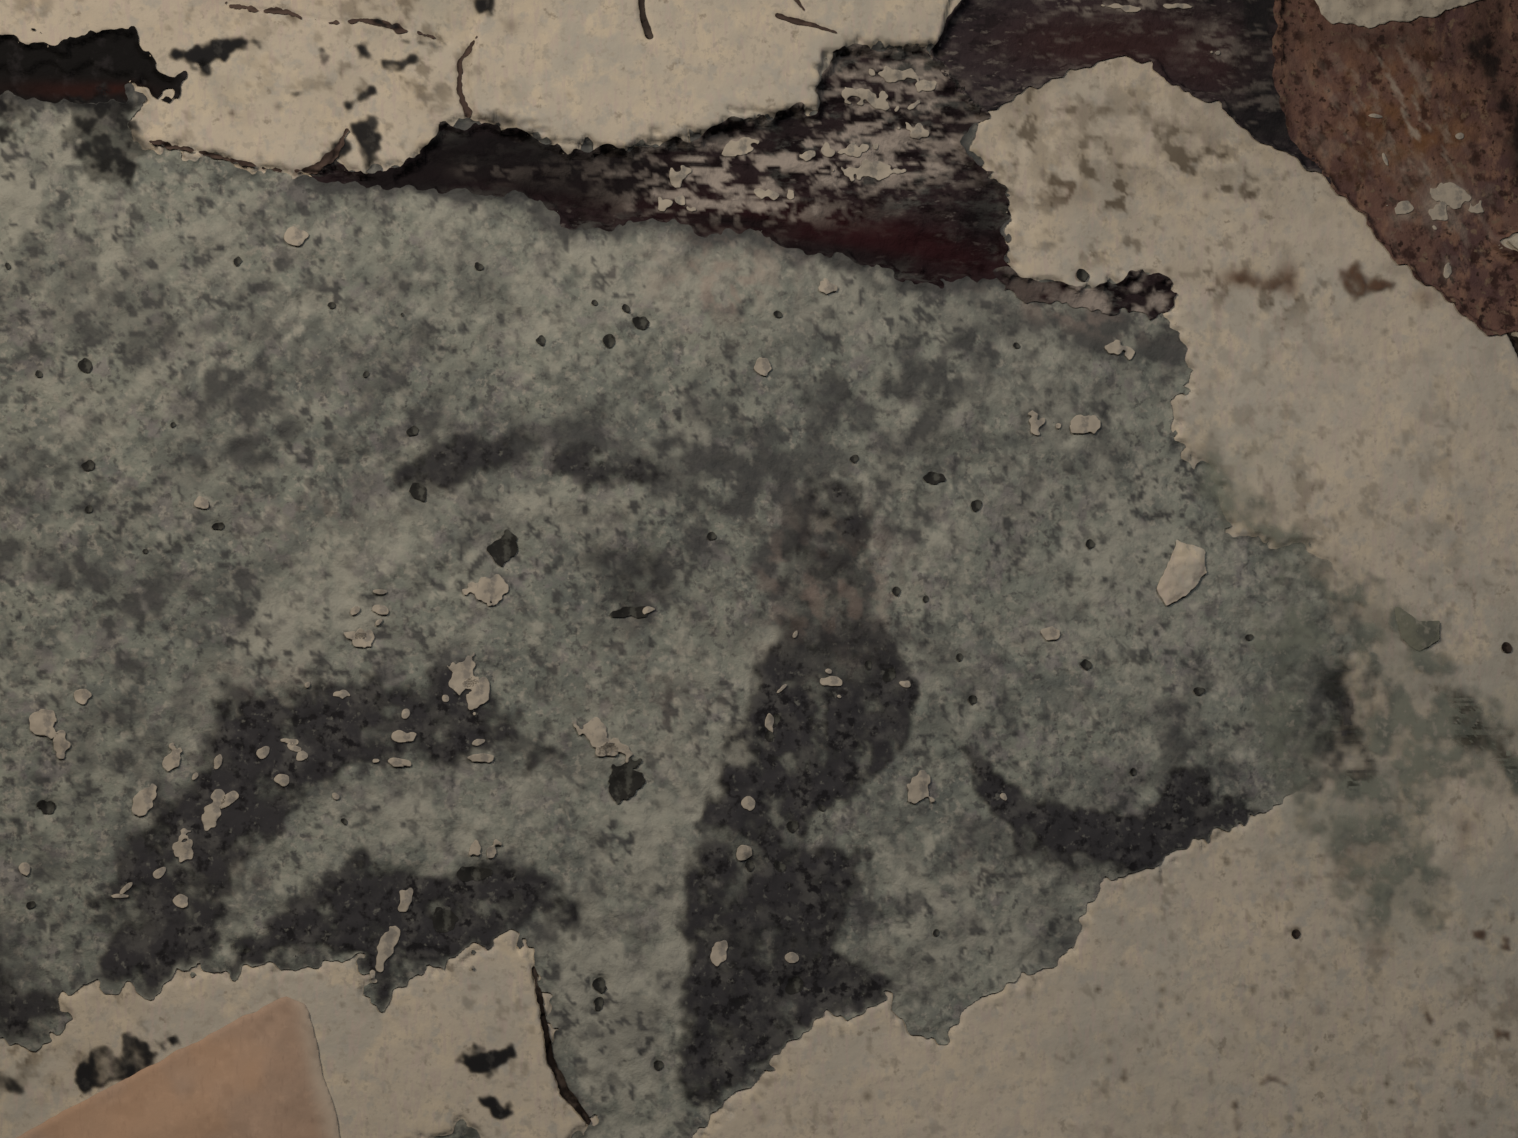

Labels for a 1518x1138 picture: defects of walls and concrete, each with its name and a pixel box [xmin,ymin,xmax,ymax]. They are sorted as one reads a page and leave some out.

spalling [0,26,187,137]
crack [638,0,653,39]
crack [775,0,837,33]
spalling [311,41,1012,289]
spalling [926,0,1518,336]
rust [1341,263,1393,297]
peeling [573,717,633,763]
leakage [89,665,578,1003]
leakage [678,634,918,1105]
leakage [965,747,1255,871]
leakage [75,1032,178,1092]
crack [532,966,591,1124]